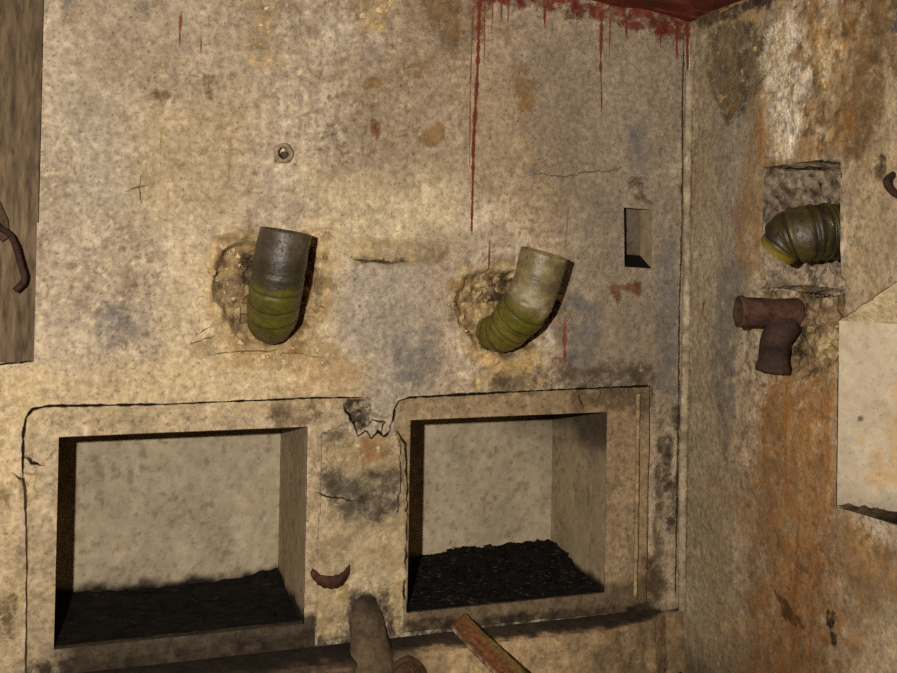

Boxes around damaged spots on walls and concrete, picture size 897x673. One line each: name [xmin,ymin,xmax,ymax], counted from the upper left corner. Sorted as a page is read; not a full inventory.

rust [469,0,691,232]
leakage [838,0,897,159]
flaking render [193,225,340,371]
flaking render [446,257,571,397]
flaking render [344,398,370,430]